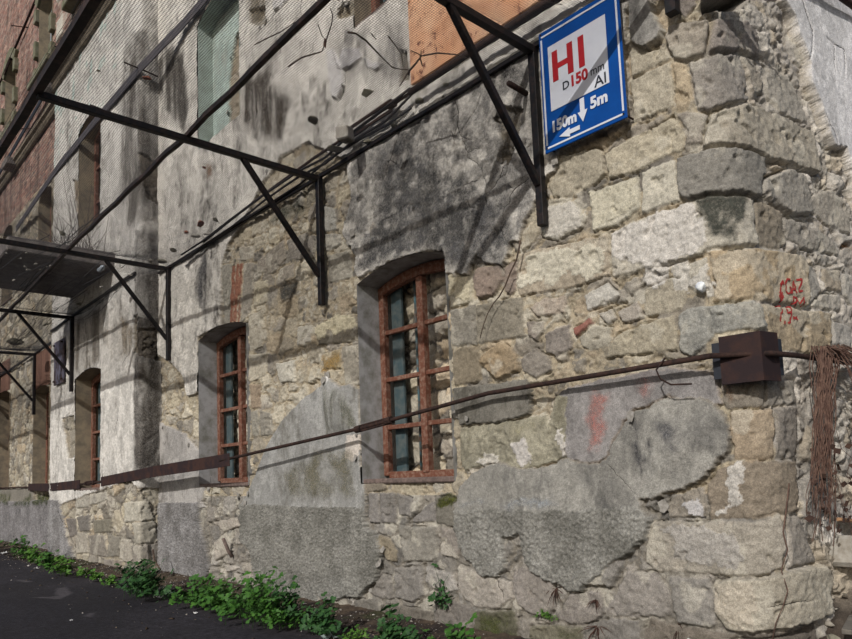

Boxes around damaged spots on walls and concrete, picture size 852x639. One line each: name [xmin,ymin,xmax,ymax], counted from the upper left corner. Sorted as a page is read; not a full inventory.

water stain [122,36,159,224]
water stain [155,50,188,128]
water stain [244,68,288,137]
crack [449,101,528,240]
water stain [122,235,161,469]
flaking render [133,314,199,448]
flaking render [200,140,367,587]
flaking render [364,0,852,639]